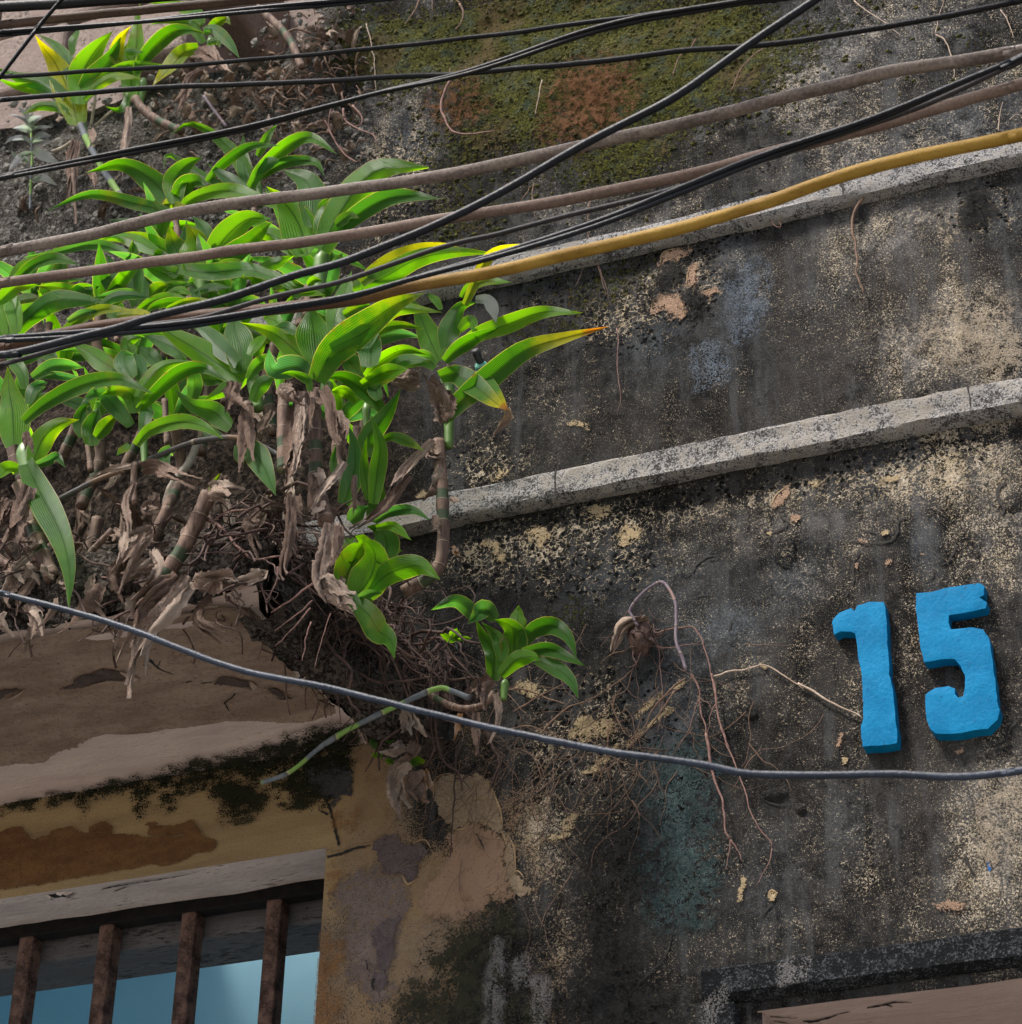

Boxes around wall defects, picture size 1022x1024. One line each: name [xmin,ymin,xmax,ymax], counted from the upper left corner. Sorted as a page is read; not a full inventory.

water stain [421,78,490,129]
water stain [537,49,642,154]
flaking render [650,248,721,321]
water stain [0,606,365,890]
flaking render [371,772,535,923]
flaking render [370,915,401,996]